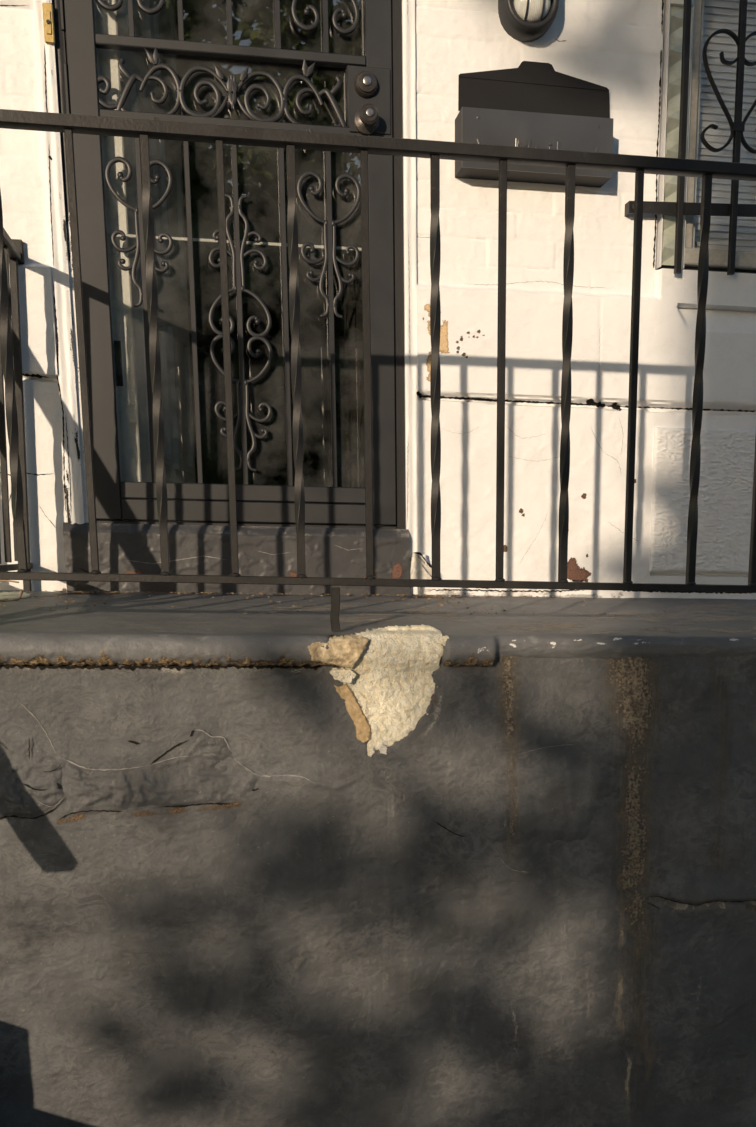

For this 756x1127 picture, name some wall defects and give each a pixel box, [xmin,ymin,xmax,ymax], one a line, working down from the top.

peeling [409,285,485,381]
spalling [308,624,449,757]
crack [642,896,756,913]